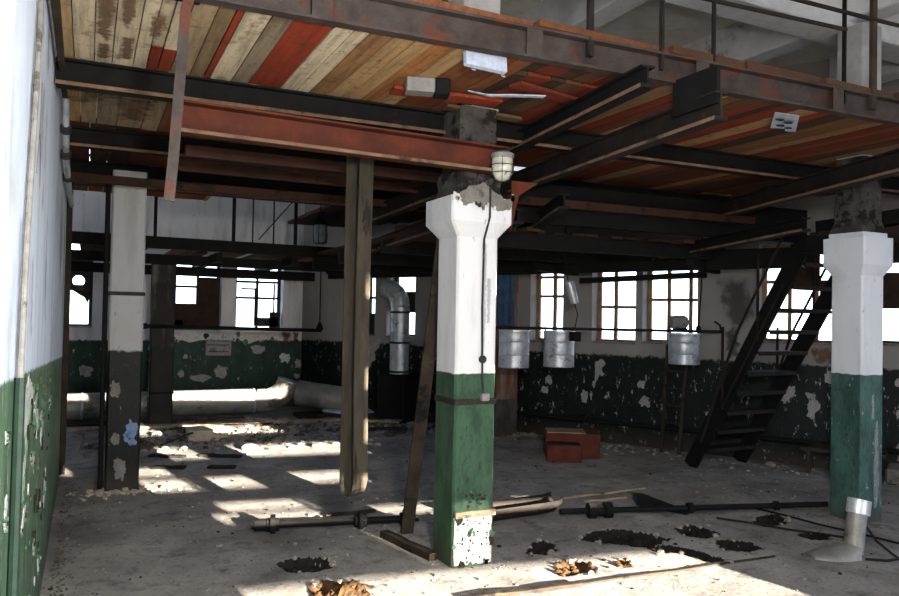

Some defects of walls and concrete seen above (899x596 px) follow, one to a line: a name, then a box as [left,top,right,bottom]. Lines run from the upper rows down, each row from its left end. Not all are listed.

leakage [96,0,137,59]
leakage [150,11,166,37]
spalling [452,179,515,211]
peeling [174,331,299,354]
peeling [110,380,121,398]
peeling [178,365,227,382]
peeling [279,352,301,378]
peeling [580,359,605,403]
peeling [637,381,650,408]
peeling [110,419,139,482]
peeling [21,374,52,575]
peeling [452,494,495,569]